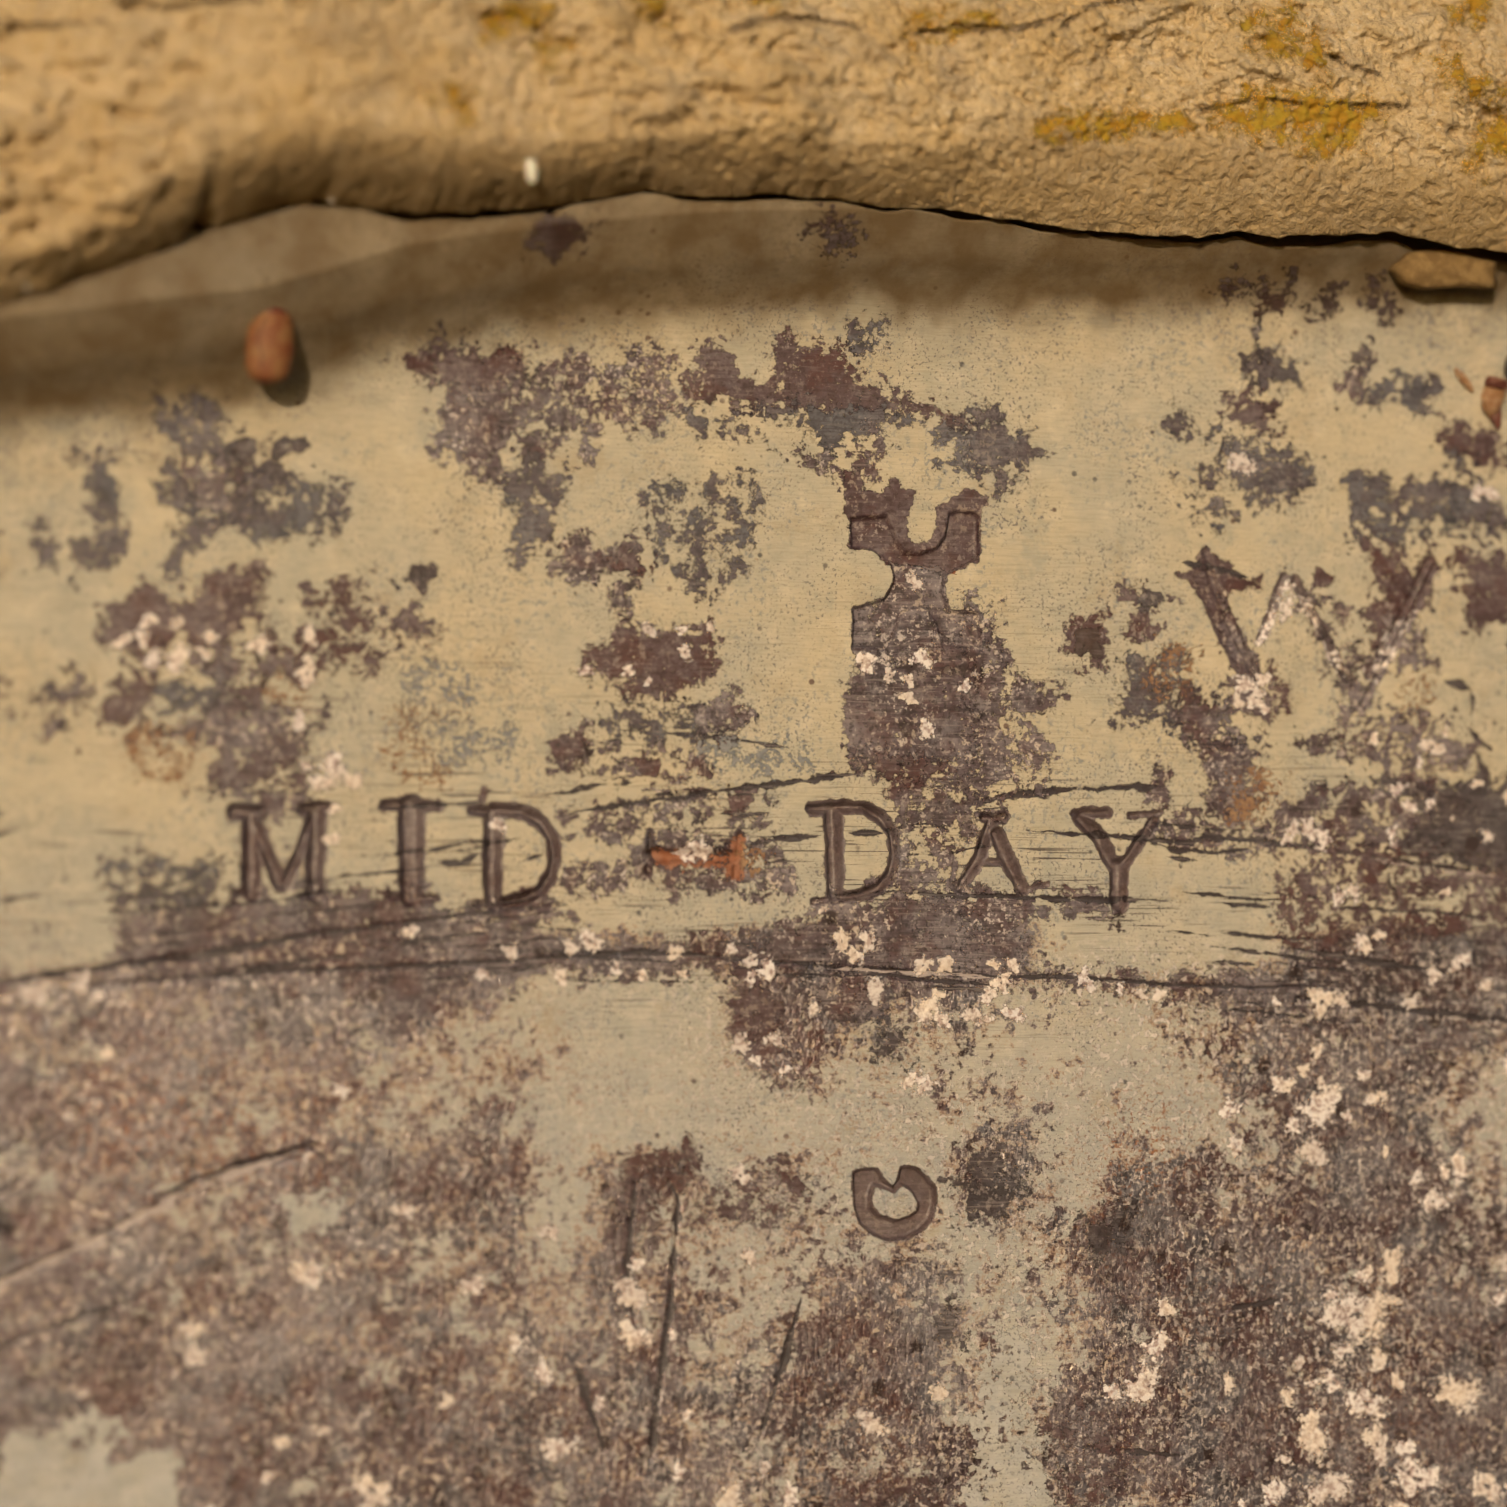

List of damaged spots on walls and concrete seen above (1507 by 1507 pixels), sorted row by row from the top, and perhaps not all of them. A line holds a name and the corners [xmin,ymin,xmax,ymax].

peeling [0,381,449,834]
peeling [361,310,1507,1093]
peeling [87,842,245,928]
rust [650,833,775,881]
rust [333,1374,377,1415]
rust [818,1459,944,1507]
rust [1035,1398,1147,1507]